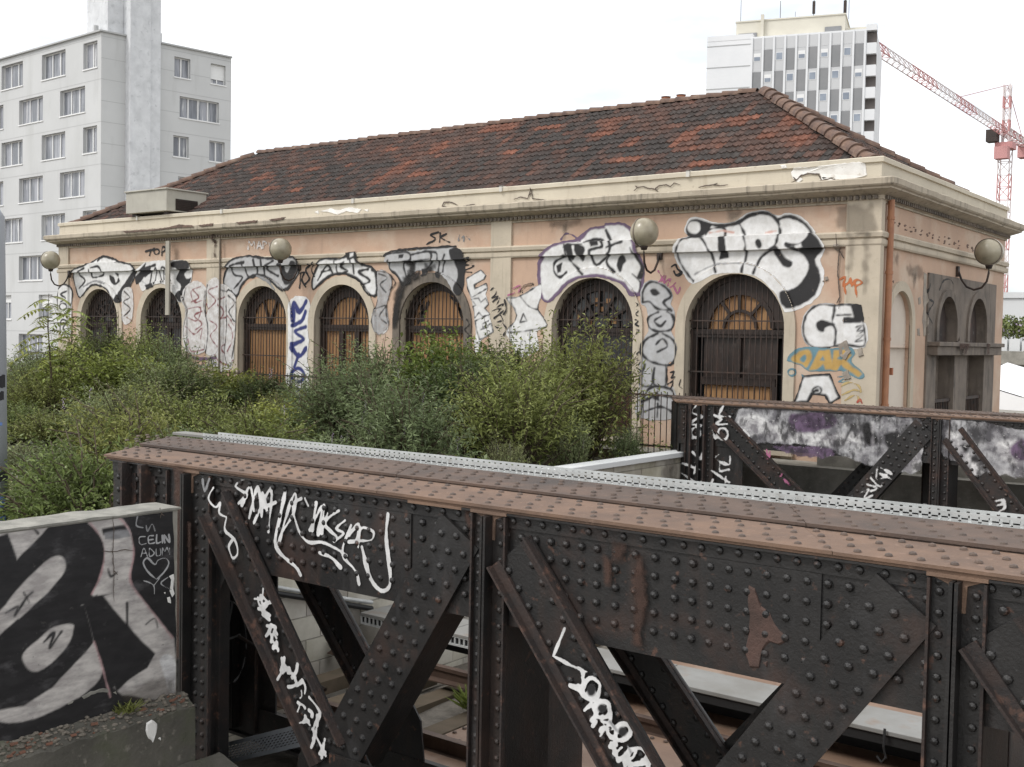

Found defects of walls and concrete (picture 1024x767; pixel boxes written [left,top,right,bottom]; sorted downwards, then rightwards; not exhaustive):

peeling [780,162,867,182]
crack [634,183,728,192]